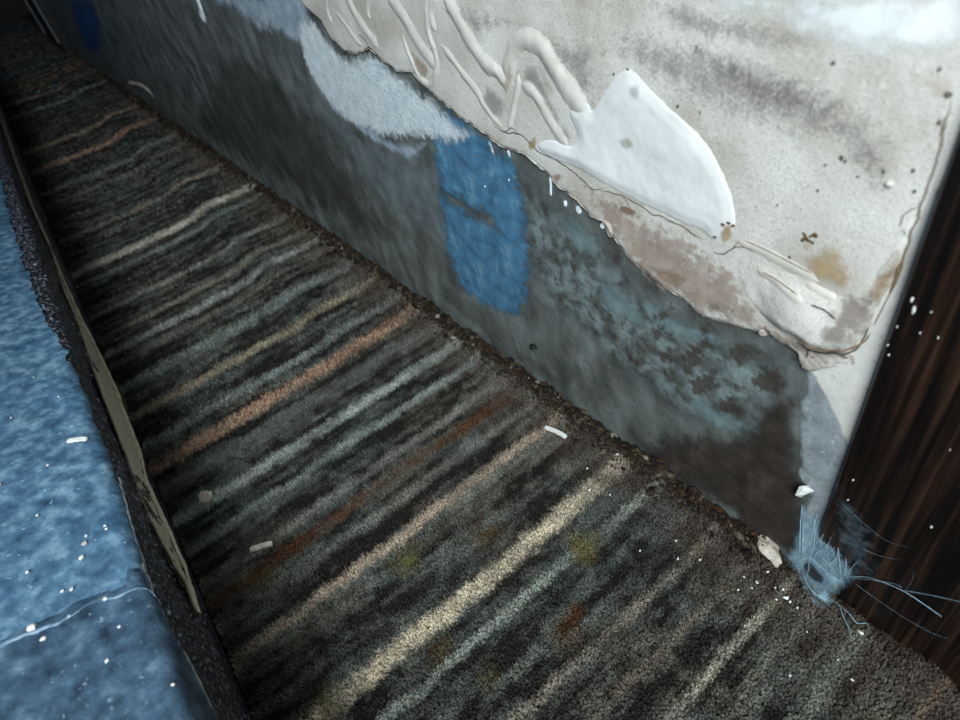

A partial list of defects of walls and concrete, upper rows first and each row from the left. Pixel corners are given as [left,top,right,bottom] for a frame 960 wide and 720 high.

leakage [218,0,530,315]
leakage [638,41,868,133]
spalling [335,42,856,436]
leakage [600,200,760,330]
leakage [650,401,800,547]